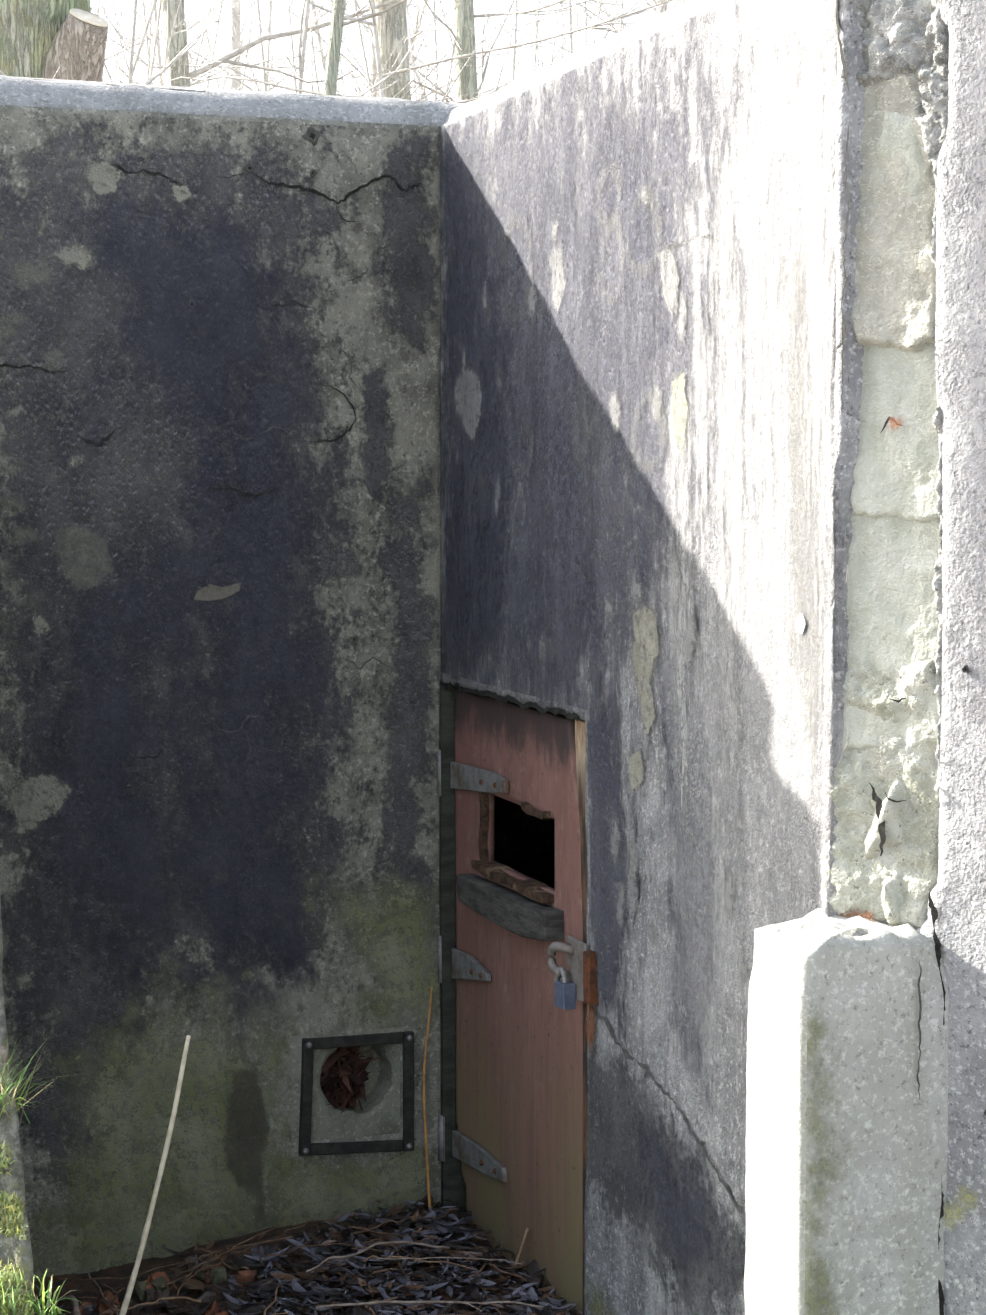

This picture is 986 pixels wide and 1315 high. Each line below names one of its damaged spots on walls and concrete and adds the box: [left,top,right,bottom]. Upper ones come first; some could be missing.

crack [111,163,183,186]
crack [216,156,421,222]
crack [836,0,850,414]
spalling [821,0,949,928]
leakage [0,15,777,1195]
leakage [795,613,805,634]
crack [916,890,946,1100]
leakage [226,1070,268,1228]
leakage [584,1031,746,1315]
crack [593,1009,740,1215]
crack [937,1180,945,1315]